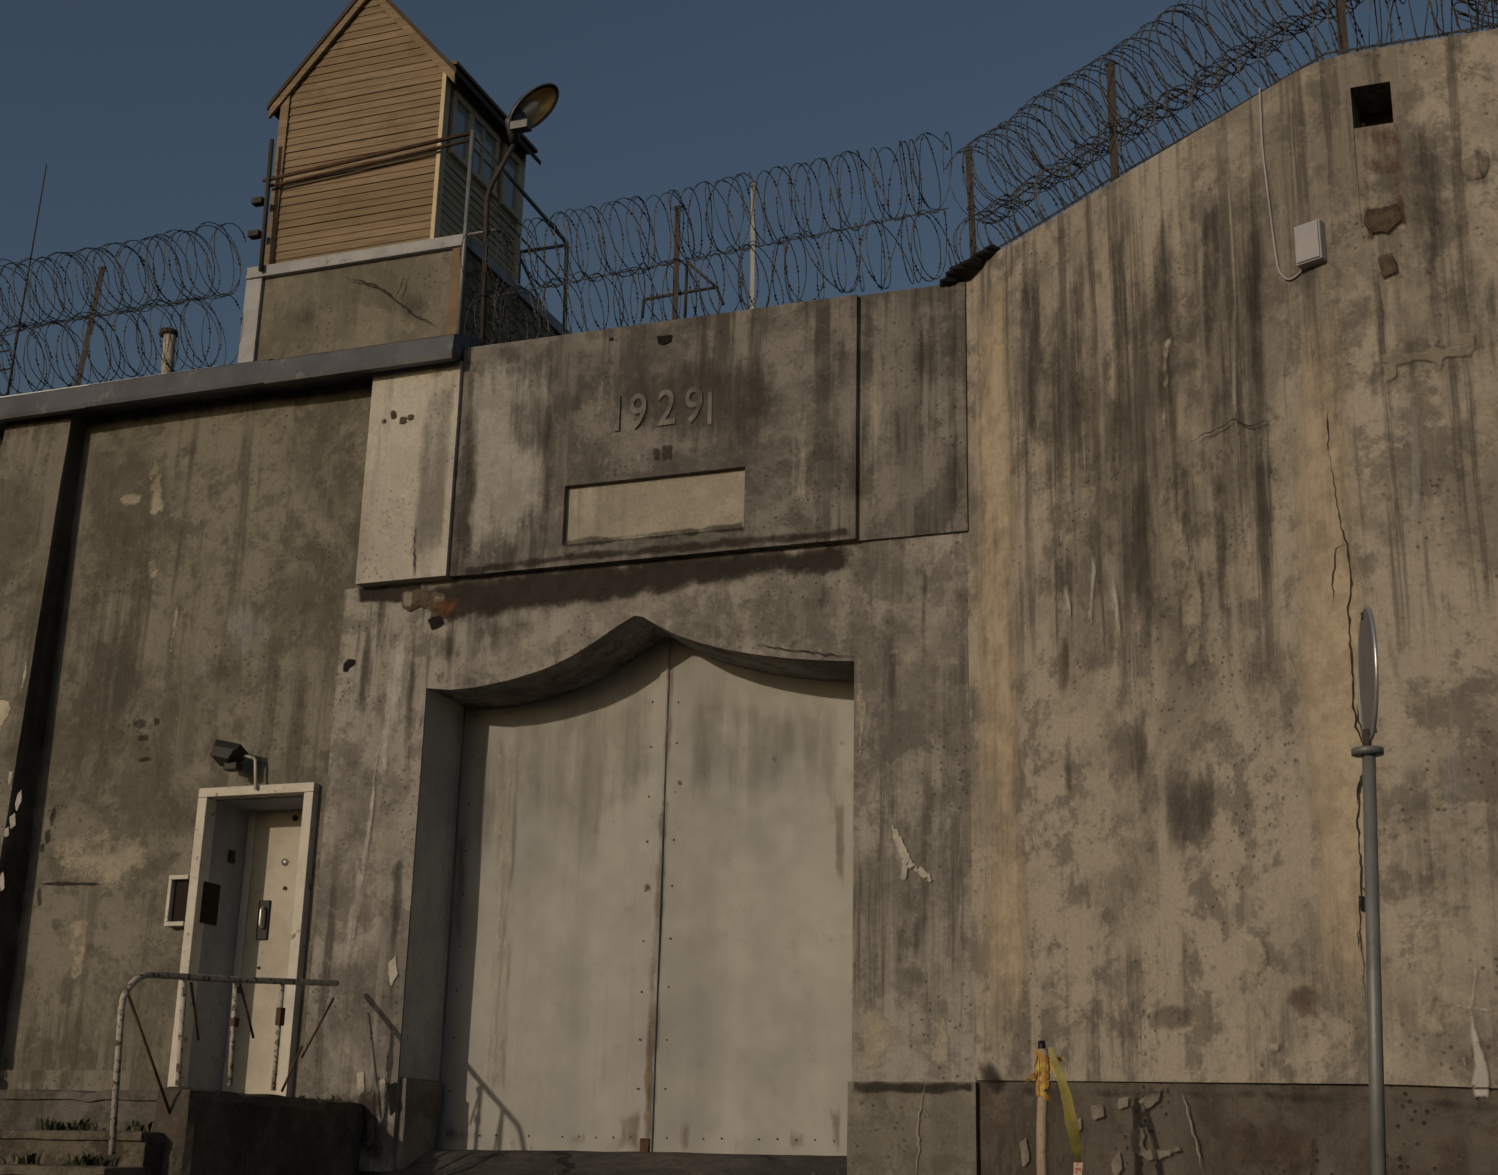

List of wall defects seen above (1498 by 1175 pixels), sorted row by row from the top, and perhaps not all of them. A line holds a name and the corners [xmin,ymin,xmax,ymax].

spalling [1363,204,1402,233]
spalling [1378,253,1398,278]
crack [347,272,431,323]
damp [1175,523,1201,625]
damp [1297,323,1382,981]
flaking render [0,700,12,732]
crack [1327,410,1367,1015]
spalling [4,771,22,837]
damp [57,830,145,888]
damp [1464,1009,1489,1096]
spalling [1077,1088,1161,1130]
spalling [1111,1126,1180,1175]